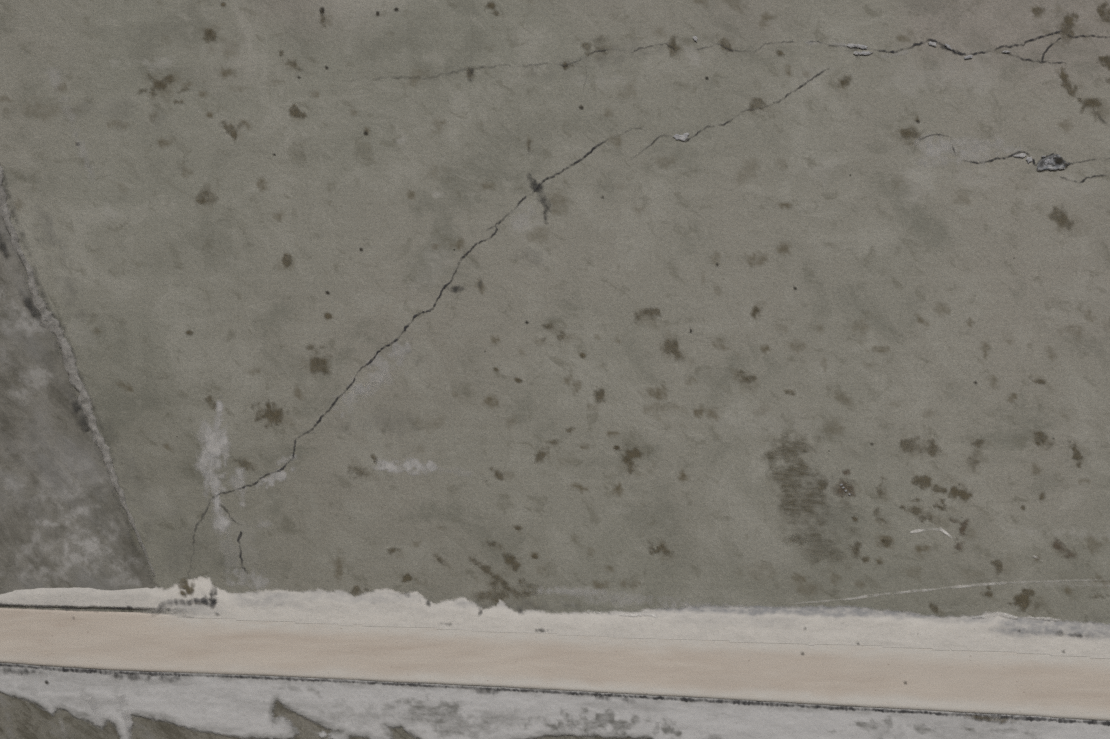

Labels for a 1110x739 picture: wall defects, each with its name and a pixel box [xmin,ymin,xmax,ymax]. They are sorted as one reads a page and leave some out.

crack [847,31,1100,63]
crack [652,121,729,143]
crack [937,134,1103,182]
crack [223,142,603,493]
peeling [0,692,369,739]
peeling [388,726,419,739]